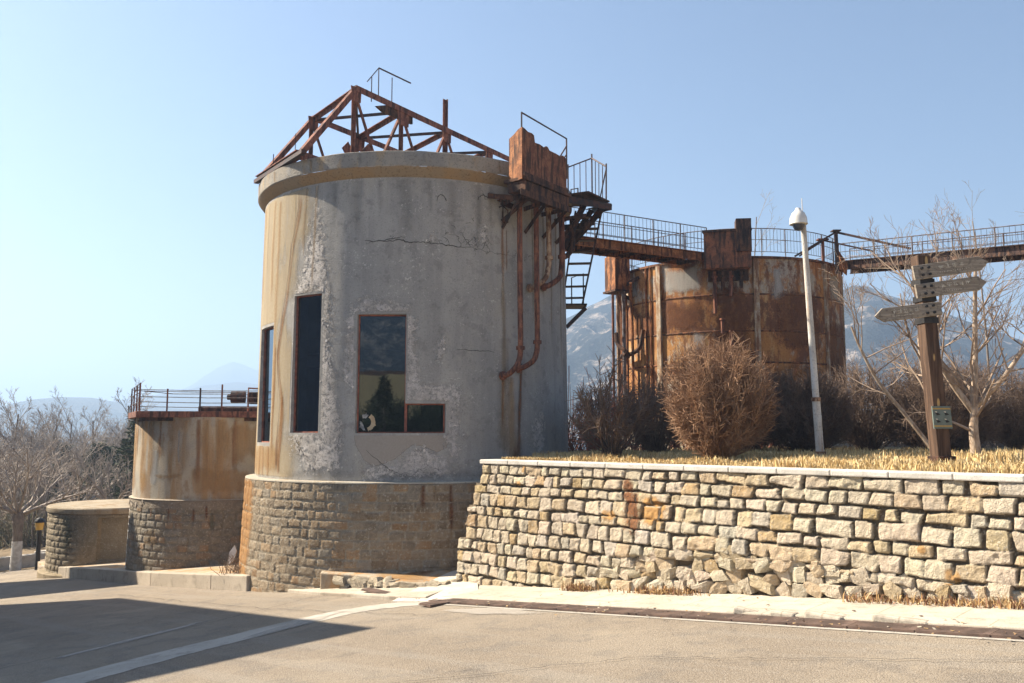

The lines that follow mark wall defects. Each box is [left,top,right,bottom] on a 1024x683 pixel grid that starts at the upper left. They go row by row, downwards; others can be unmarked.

crack [365,194,517,262]
rust [238,189,308,574]
peeling [288,199,464,481]
rust [715,287,754,366]
rust [777,291,846,389]